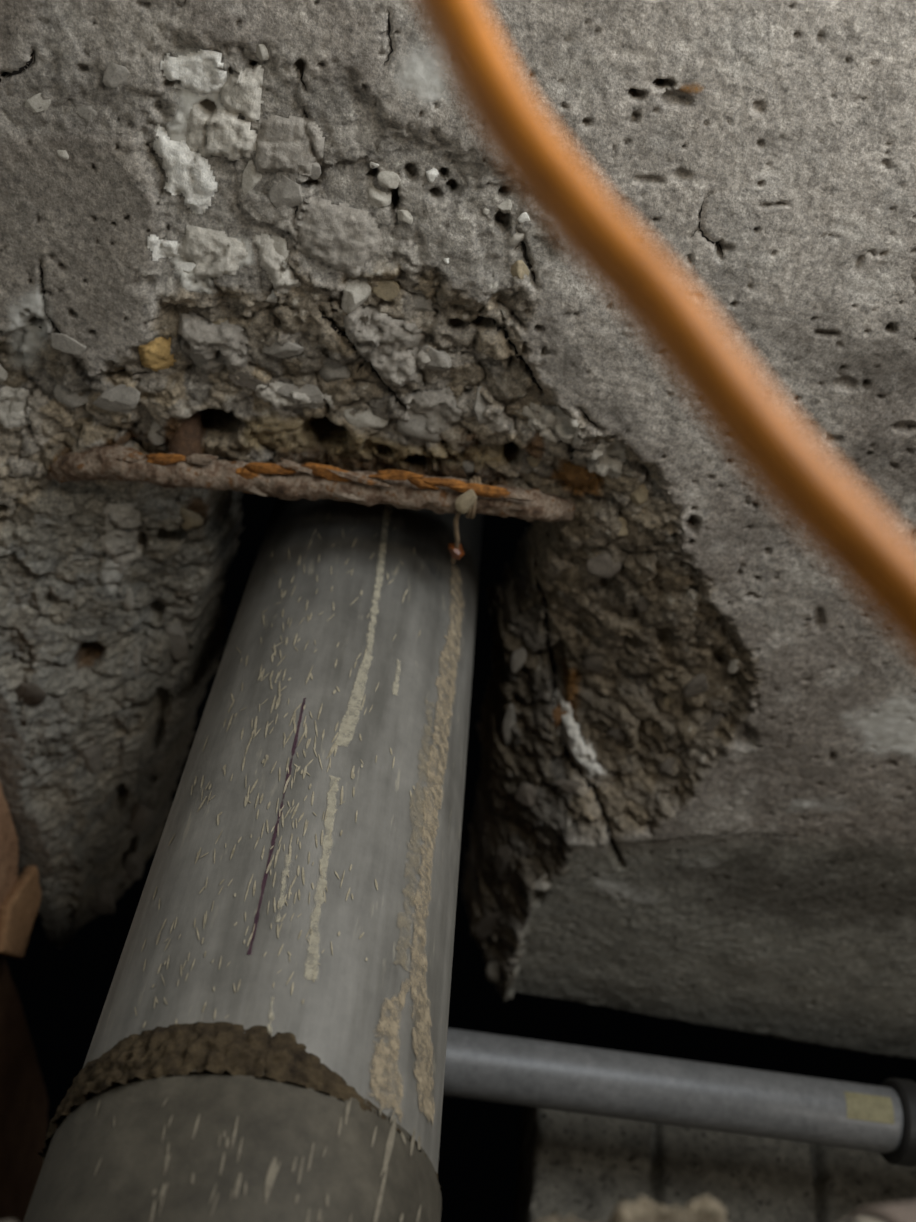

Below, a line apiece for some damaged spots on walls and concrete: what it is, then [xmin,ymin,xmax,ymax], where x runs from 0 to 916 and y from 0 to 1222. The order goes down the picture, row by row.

crack [0,51,34,82]
rust [278,431,507,486]
spalling [0,34,763,1002]